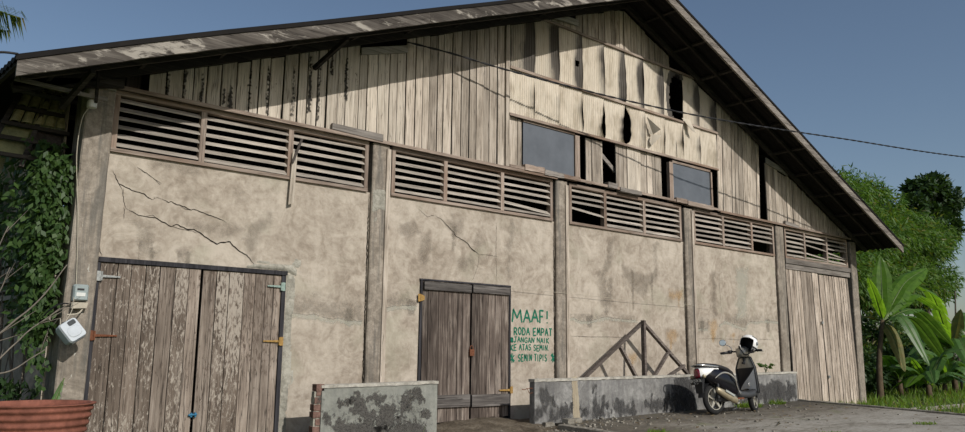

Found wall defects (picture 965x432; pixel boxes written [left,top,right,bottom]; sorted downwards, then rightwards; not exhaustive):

crack [113,167,254,264]